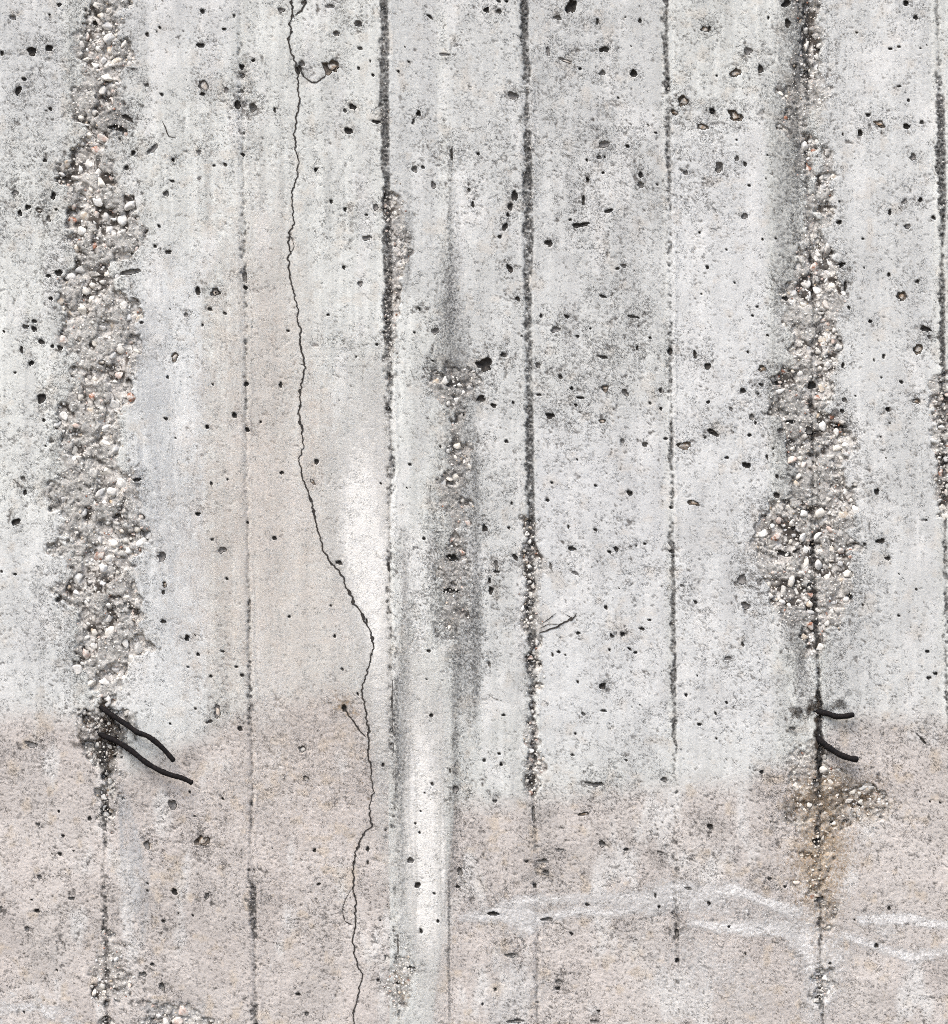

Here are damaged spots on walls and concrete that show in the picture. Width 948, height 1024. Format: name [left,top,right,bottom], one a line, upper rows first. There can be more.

spalling [45,0,156,841]
crack [286,0,375,1024]
spalling [747,0,863,673]